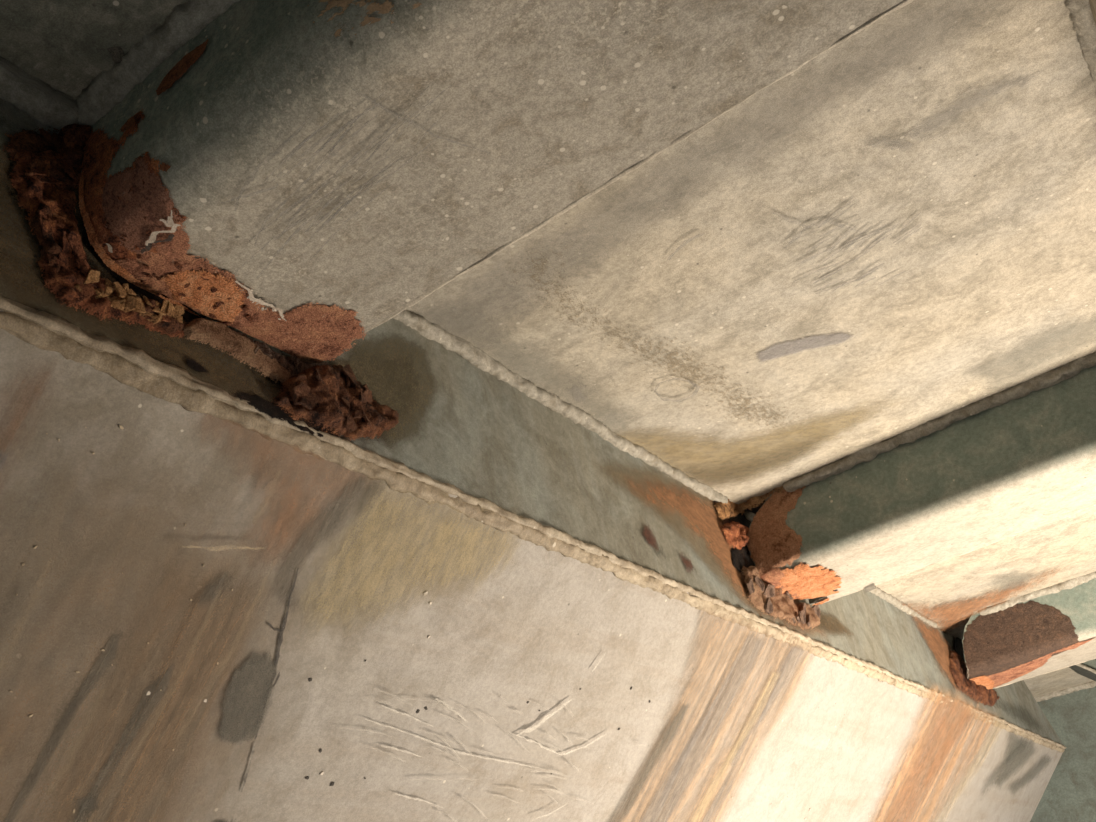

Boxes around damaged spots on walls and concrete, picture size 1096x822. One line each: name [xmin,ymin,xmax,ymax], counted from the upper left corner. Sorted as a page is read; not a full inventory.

rust [156,39,209,95]
rust [58,110,367,384]
damp [500,243,863,482]
damp [0,496,276,822]
damp [278,480,509,619]
rust [613,616,810,822]
rust [613,469,842,633]
rust [914,574,1095,690]